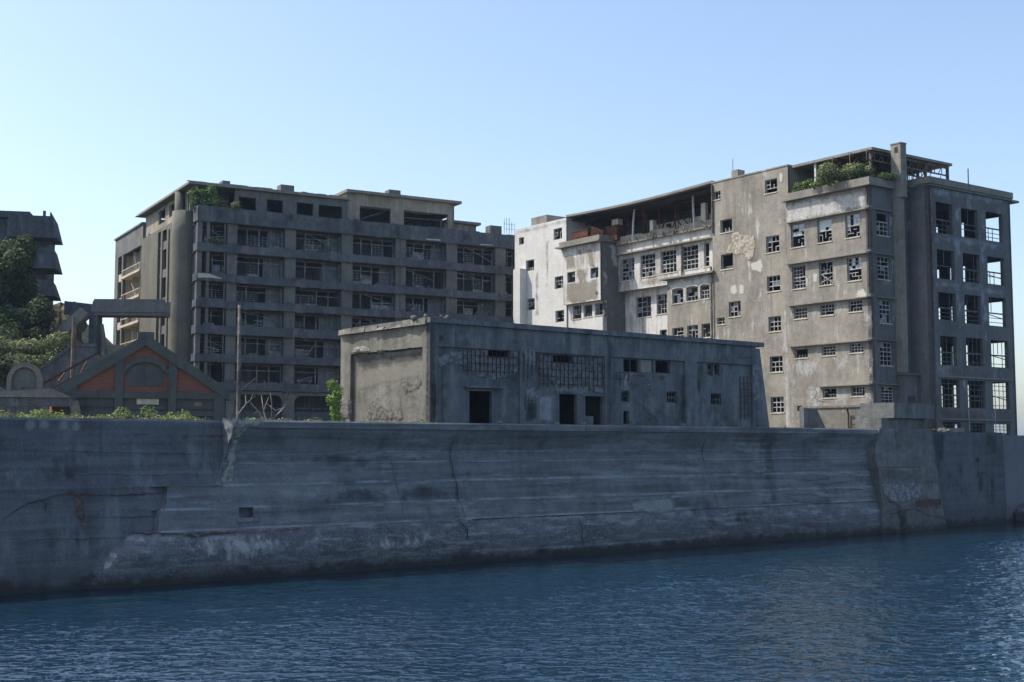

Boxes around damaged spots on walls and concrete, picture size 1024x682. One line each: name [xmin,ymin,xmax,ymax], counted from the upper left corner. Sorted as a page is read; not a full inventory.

flaking render [726,232,763,272]
crack [3,450,253,541]
water stain [205,535,279,559]